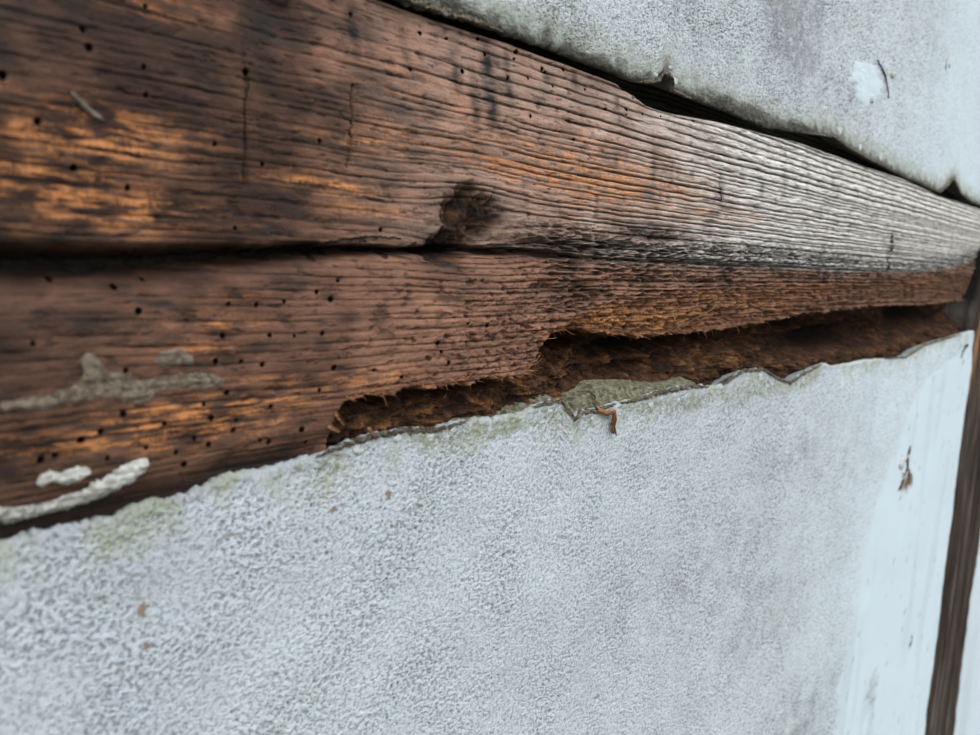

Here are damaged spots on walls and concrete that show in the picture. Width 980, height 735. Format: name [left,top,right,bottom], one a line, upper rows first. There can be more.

peeling [848,59,896,107]
spalling [532,364,822,421]
spalling [898,446,913,490]